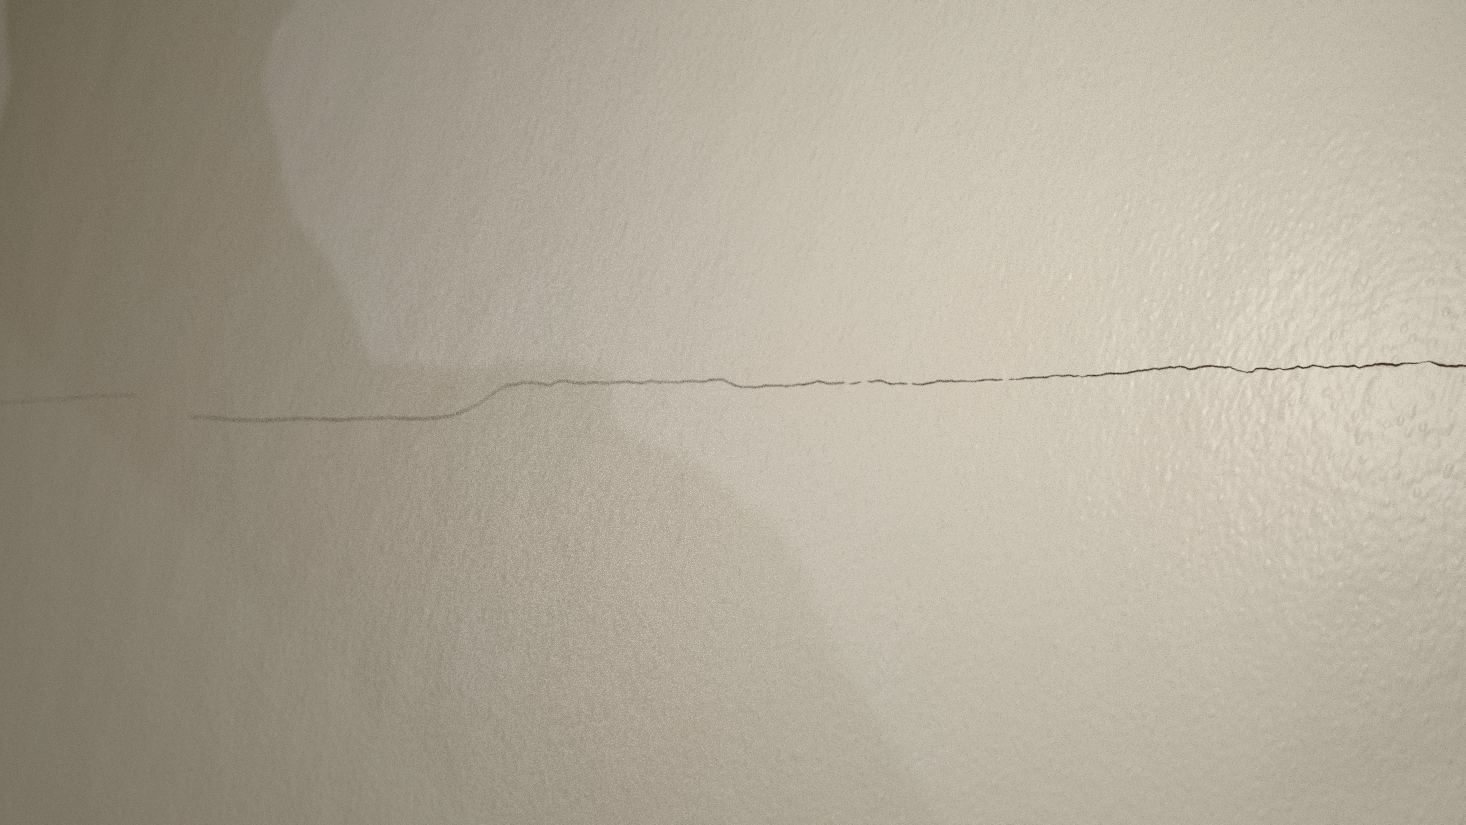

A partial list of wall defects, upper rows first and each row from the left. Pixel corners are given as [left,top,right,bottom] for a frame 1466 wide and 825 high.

crack [189,359,1466,421]